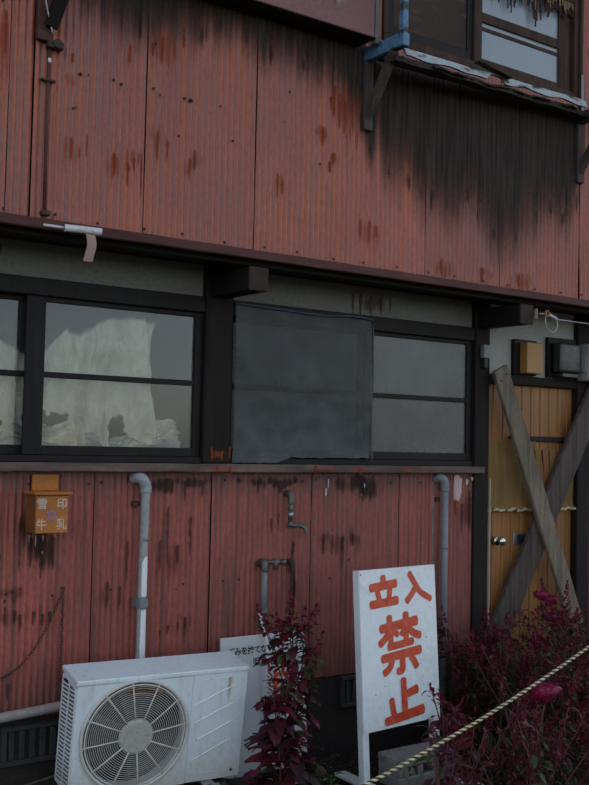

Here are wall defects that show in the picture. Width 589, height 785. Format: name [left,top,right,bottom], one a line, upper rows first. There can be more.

corrosion [111,151,142,199]
leakage [18,515,64,577]